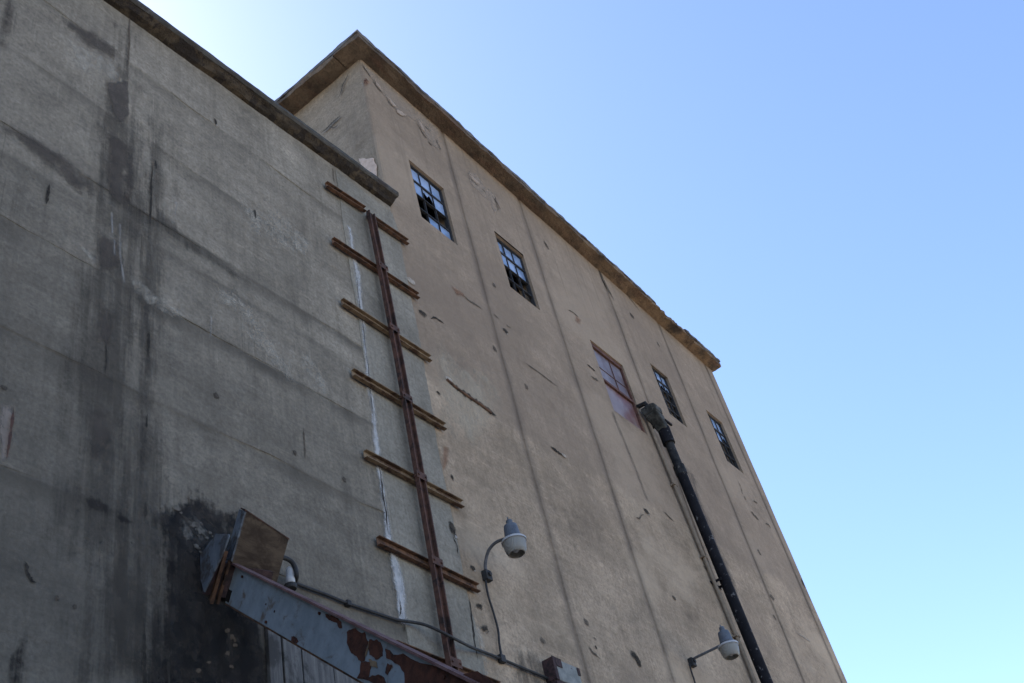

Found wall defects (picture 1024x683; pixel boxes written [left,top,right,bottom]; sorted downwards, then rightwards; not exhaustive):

peeling [359,158,377,176]
water stain [148,500,267,683]
corrosion [325,614,494,683]